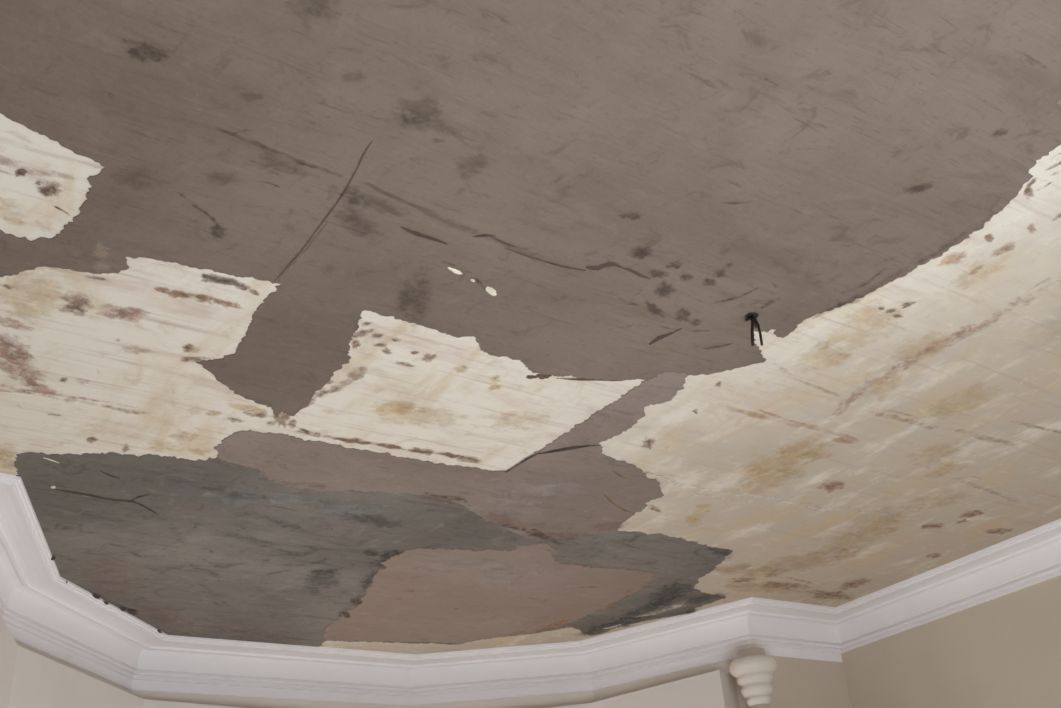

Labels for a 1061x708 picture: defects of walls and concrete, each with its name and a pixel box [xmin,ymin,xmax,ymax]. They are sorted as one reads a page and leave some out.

spalling [400,227,447,245]
spalling [505,248,650,279]
water stain [156,288,231,306]
water stain [203,274,258,295]
flaking render [447,267,497,296]
peeling [353,323,397,354]
peeling [334,439,479,463]
crack [55,471,157,514]